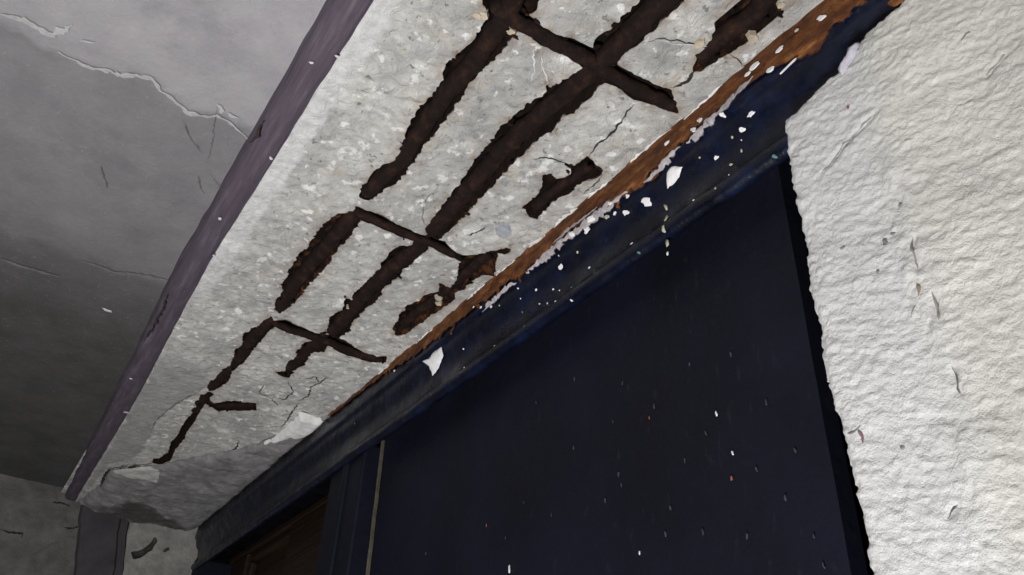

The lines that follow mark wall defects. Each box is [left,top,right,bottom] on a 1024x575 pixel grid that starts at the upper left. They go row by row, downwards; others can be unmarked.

crack [151,388,203,430]
crack [232,377,327,450]
spalling [152,0,786,464]
rust [325,0,866,421]